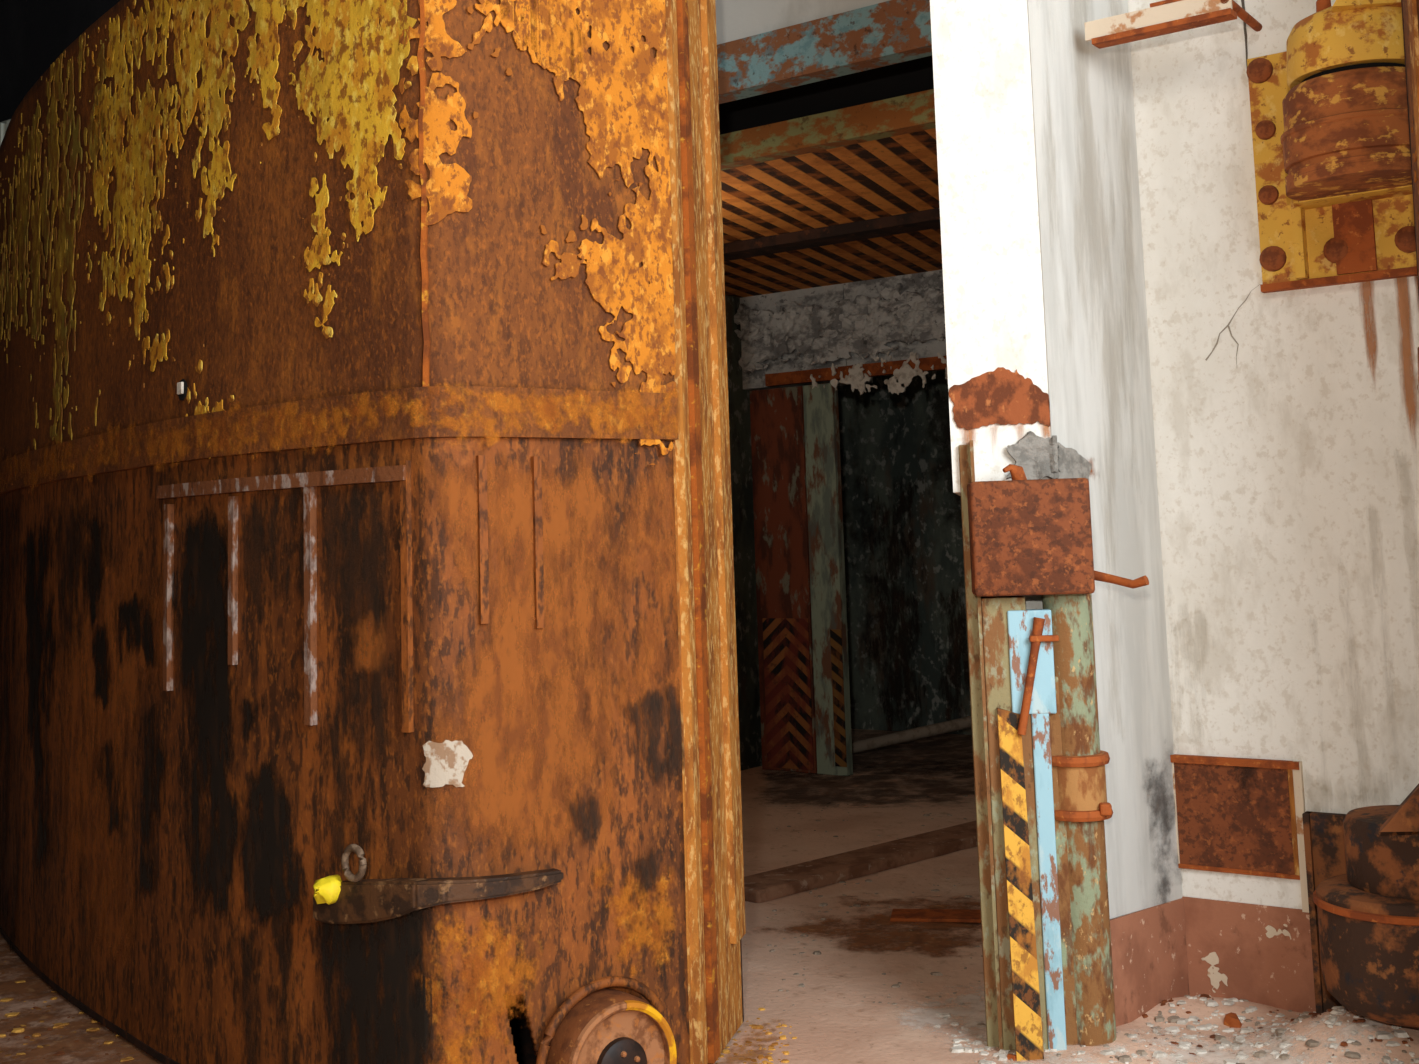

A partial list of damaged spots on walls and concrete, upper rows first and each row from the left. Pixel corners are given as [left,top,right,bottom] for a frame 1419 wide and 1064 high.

peeling [0,0,423,450]
corrosion [1,393,429,490]
corrosion [397,0,682,856]
spalling [734,283,1092,481]
corrosion [965,429,974,445]
corrosion [1362,281,1377,374]
corrosion [1396,276,1419,427]
corrosion [356,613,386,670]
corrosion [614,878,673,972]
corrosion [0,933,161,1064]
corrosion [438,918,533,1064]
corrosion [717,1023,775,1064]